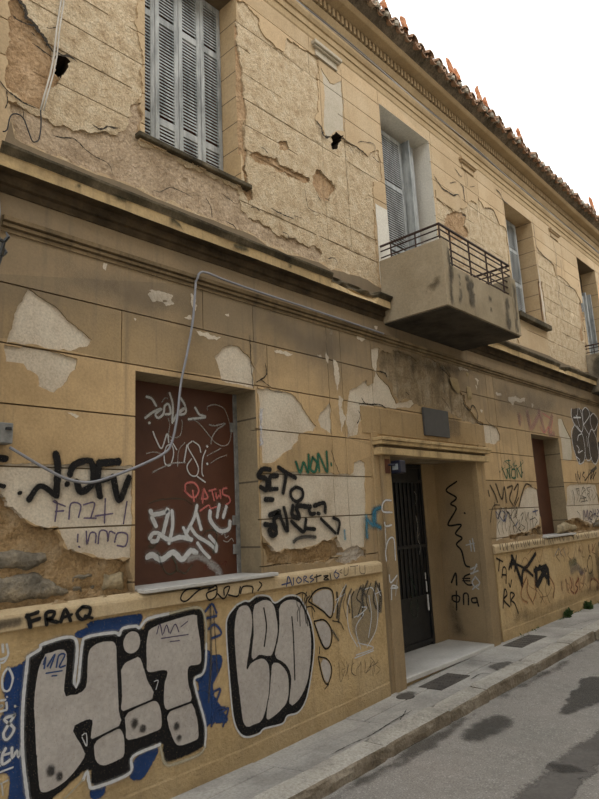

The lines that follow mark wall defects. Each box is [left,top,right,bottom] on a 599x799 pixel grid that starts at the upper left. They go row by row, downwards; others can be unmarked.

peeling [5,0,381,287]
peeling [4,290,91,392]
peeling [148,290,174,306]
peeling [197,331,499,565]
spalling [0,463,132,610]